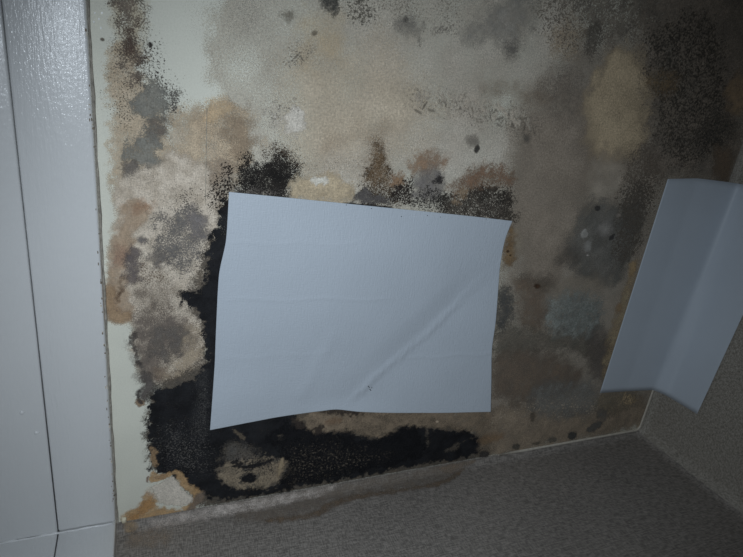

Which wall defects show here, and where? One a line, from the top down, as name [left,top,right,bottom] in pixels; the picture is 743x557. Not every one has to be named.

water stain [104,0,743,507]